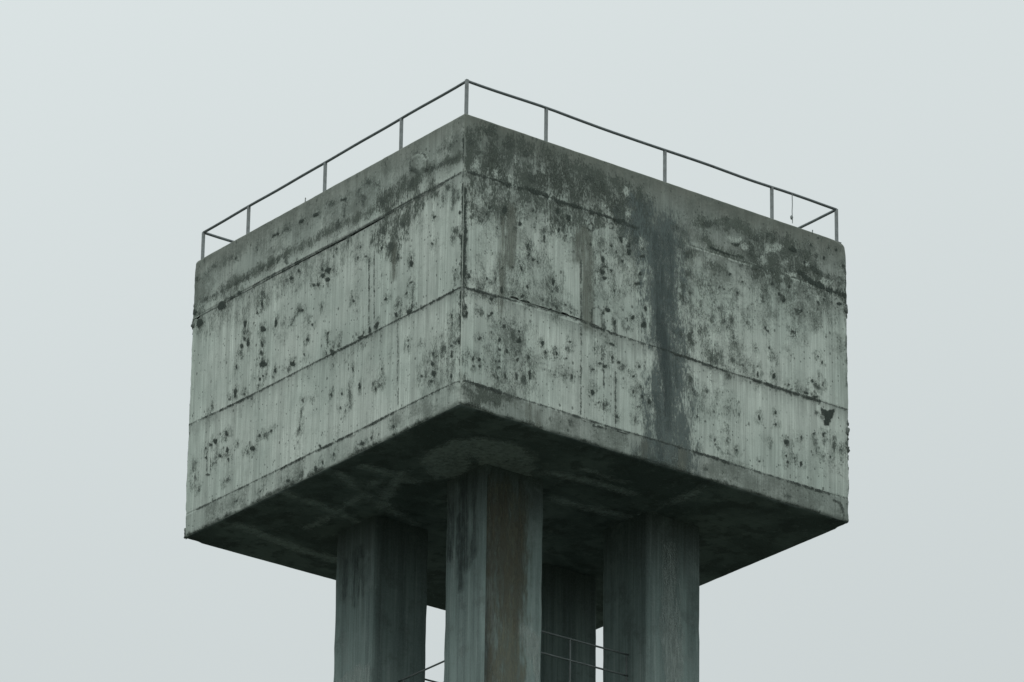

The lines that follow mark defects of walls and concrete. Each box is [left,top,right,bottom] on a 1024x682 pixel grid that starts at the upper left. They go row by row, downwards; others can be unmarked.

water stain [193,122,847,476]
spalling [705,342,846,467]